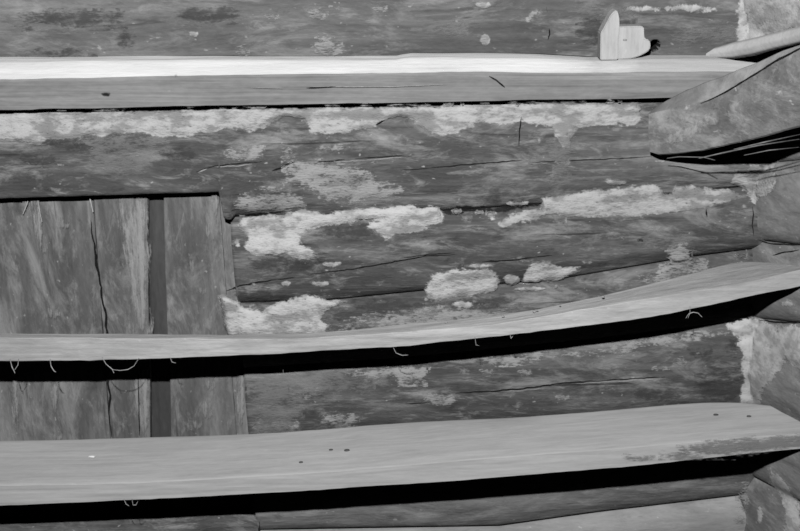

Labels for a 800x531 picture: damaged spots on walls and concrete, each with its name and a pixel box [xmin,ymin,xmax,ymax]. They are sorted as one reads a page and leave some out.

crack [91,226,108,334]
crack [312,253,455,274]
crack [484,254,551,262]
crack [105,360,113,436]